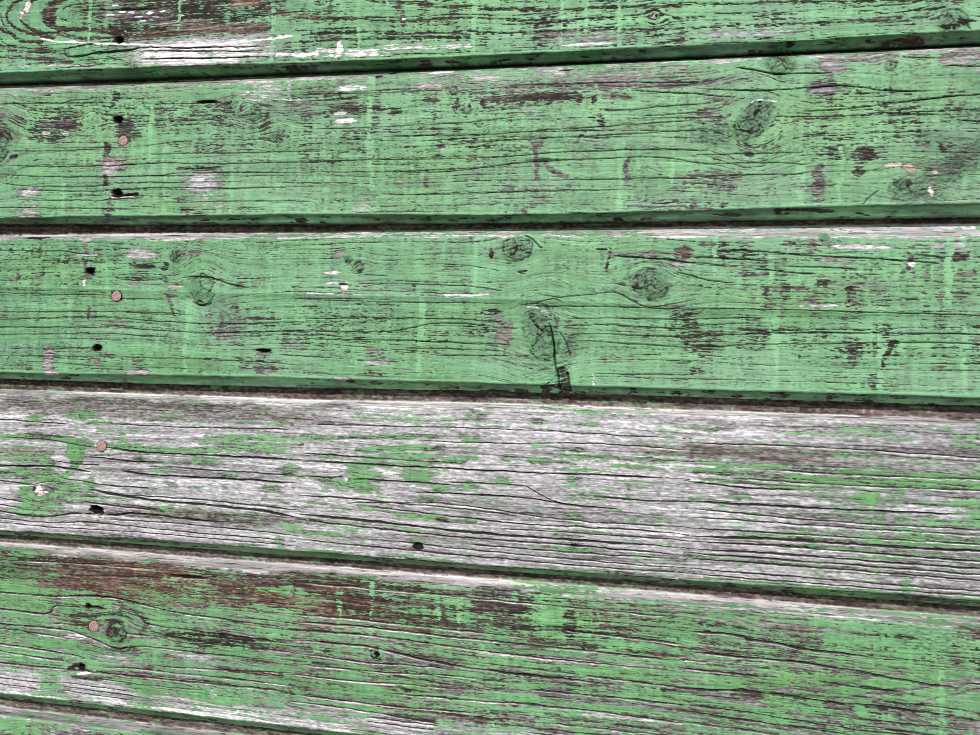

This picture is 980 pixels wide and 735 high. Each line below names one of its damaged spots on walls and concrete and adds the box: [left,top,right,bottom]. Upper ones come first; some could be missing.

peeling [90,0,281,70]
peeling [938,48,980,67]
peeling [457,72,688,103]
peeling [158,99,222,122]
peeling [24,113,77,143]
peeling [715,242,757,263]
peeling [211,325,281,372]
crack [541,329,572,393]
peeling [470,597,533,635]
peeling [63,604,276,663]
peeling [0,674,138,707]
peeling [362,713,435,735]